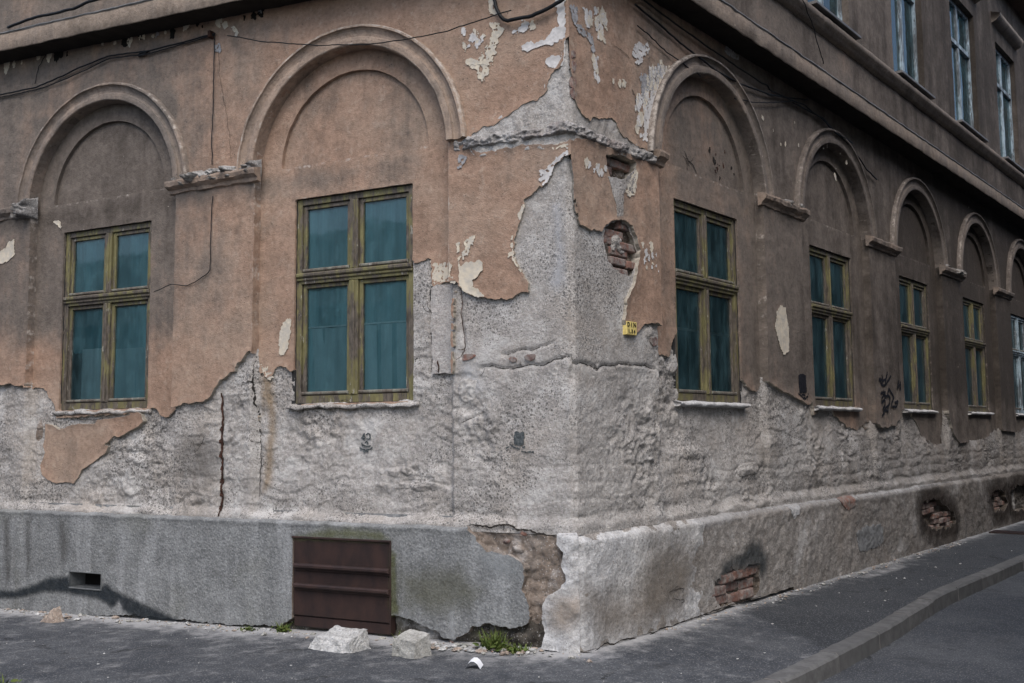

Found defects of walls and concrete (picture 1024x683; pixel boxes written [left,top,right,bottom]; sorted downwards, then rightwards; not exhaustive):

flaking render [461,0,643,156]
peeling [632,42,650,65]
peeling [634,60,670,142]
flaking render [0,150,1024,624]